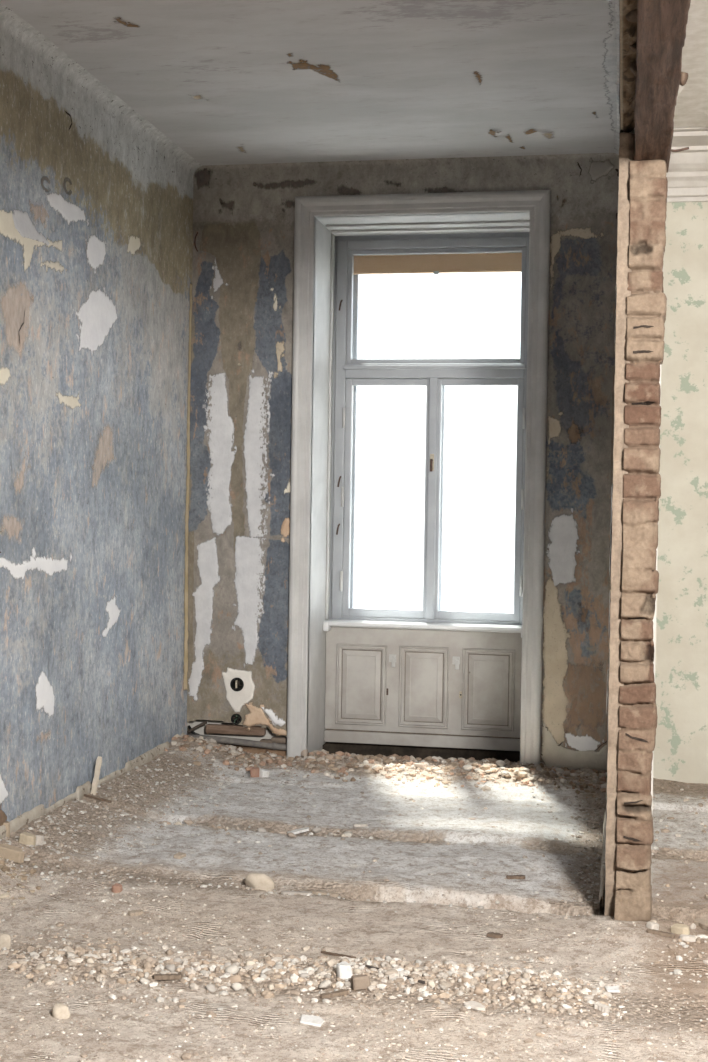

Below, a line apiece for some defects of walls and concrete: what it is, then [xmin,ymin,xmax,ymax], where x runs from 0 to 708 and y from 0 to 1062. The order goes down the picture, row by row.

peeling [287,53,338,81]
peeling [0,210,67,351]
peeling [0,367,11,385]
peeling [268,341,285,378]
peeling [56,392,81,409]
peeling [92,427,114,487]
flaking render [281,518,290,542]
flaking render [541,159,668,922]